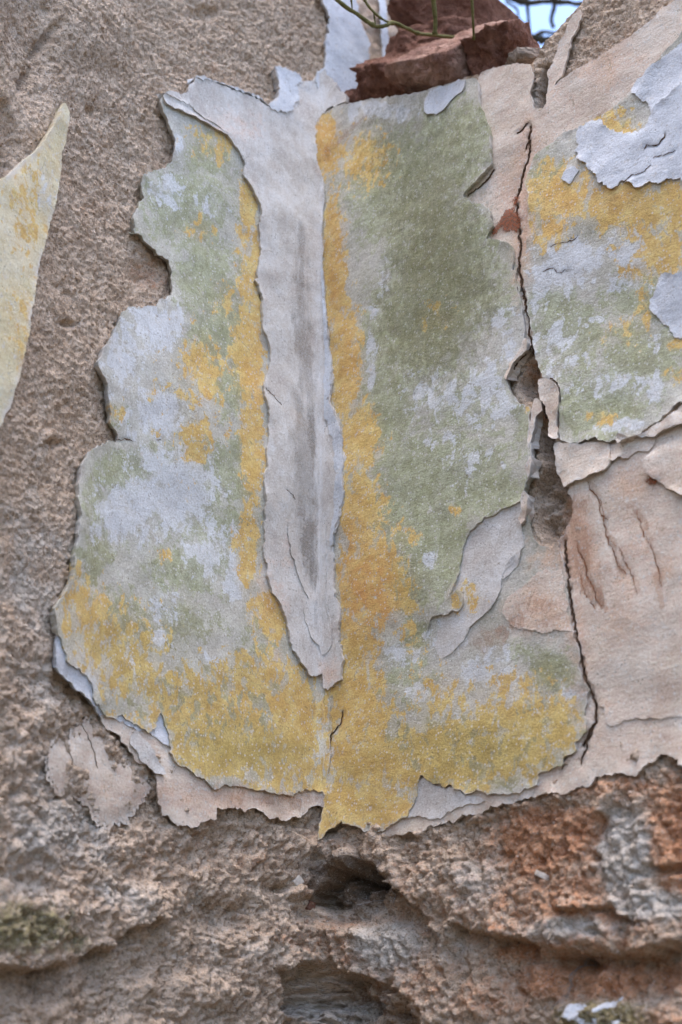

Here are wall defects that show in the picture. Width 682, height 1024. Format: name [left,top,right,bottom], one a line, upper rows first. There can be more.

peeling [0,103,70,426]
peeling [43,0,682,840]
crack [514,123,577,419]
crack [560,539,602,771]